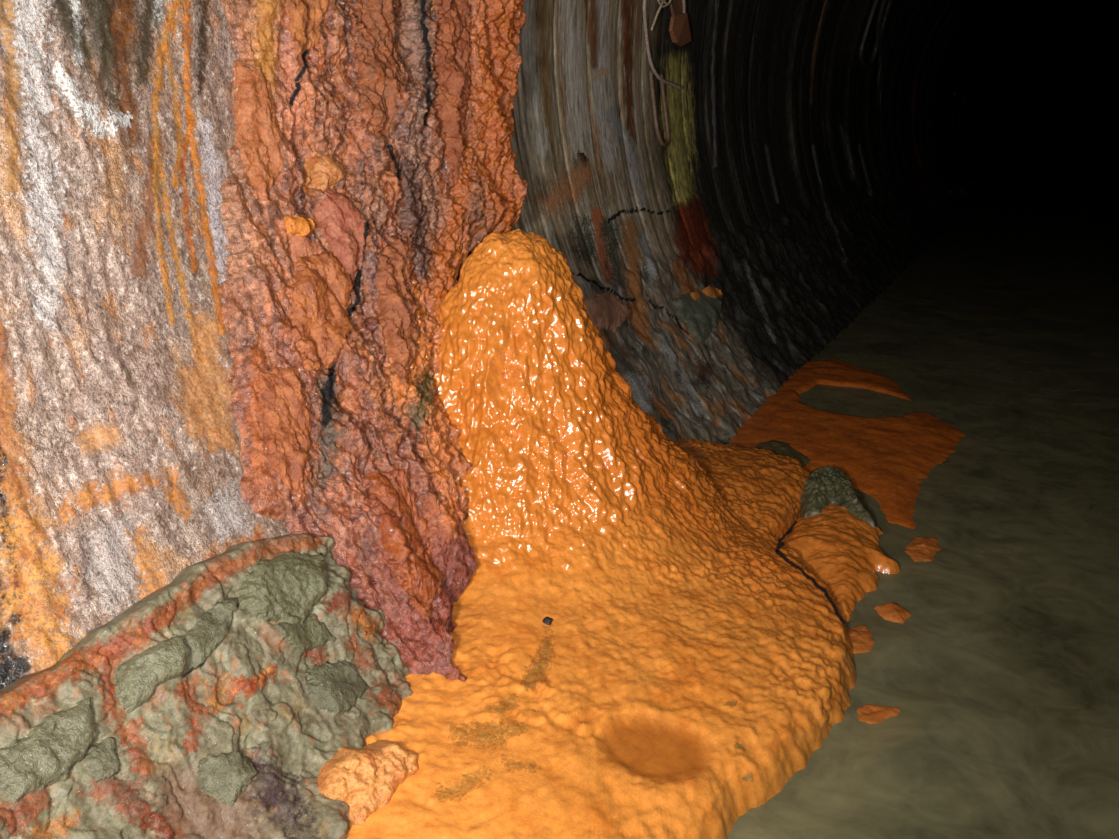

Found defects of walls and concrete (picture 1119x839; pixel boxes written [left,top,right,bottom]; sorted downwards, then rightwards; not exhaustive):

corrosion [0,0,22,195]
leakage [0,0,133,332]
leakage [135,0,169,85]
corrosion [256,0,280,95]
corrosion [109,0,268,491]
corrosion [591,208,653,345]
leakage [0,442,29,690]
leakage [74,502,144,616]
corrosion [0,321,328,839]
crack [775,517,845,624]
corrosion [326,586,402,717]
leakage [249,744,319,839]